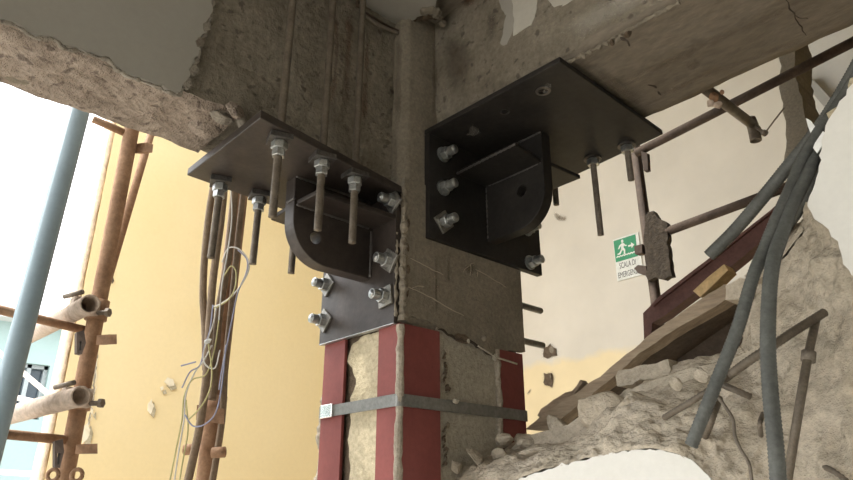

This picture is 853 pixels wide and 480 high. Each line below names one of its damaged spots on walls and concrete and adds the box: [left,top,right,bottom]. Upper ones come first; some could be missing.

peeling [499,0,537,46]
crack [786,0,808,35]
spalling [0,24,247,153]
spalling [457,283,769,480]
spalling [776,202,853,480]